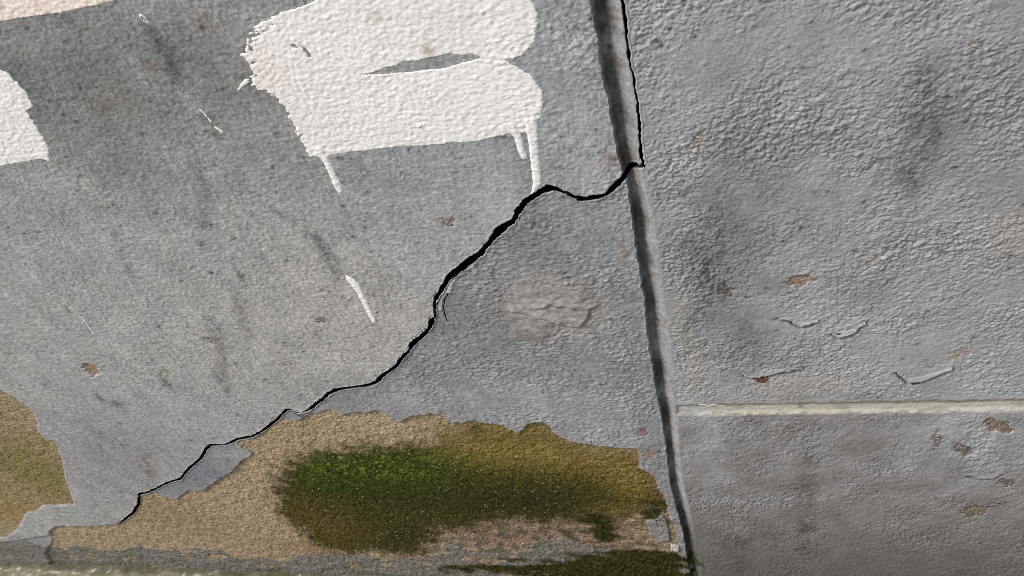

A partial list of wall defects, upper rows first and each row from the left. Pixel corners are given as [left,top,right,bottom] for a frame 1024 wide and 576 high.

crack [100,0,647,526]
spalling [785,274,817,287]
peeling [744,367,802,383]
peeling [897,348,970,385]
spalling [984,417,1013,433]
spalling [931,428,974,456]
peeling [48,409,683,576]
spalling [959,504,989,517]